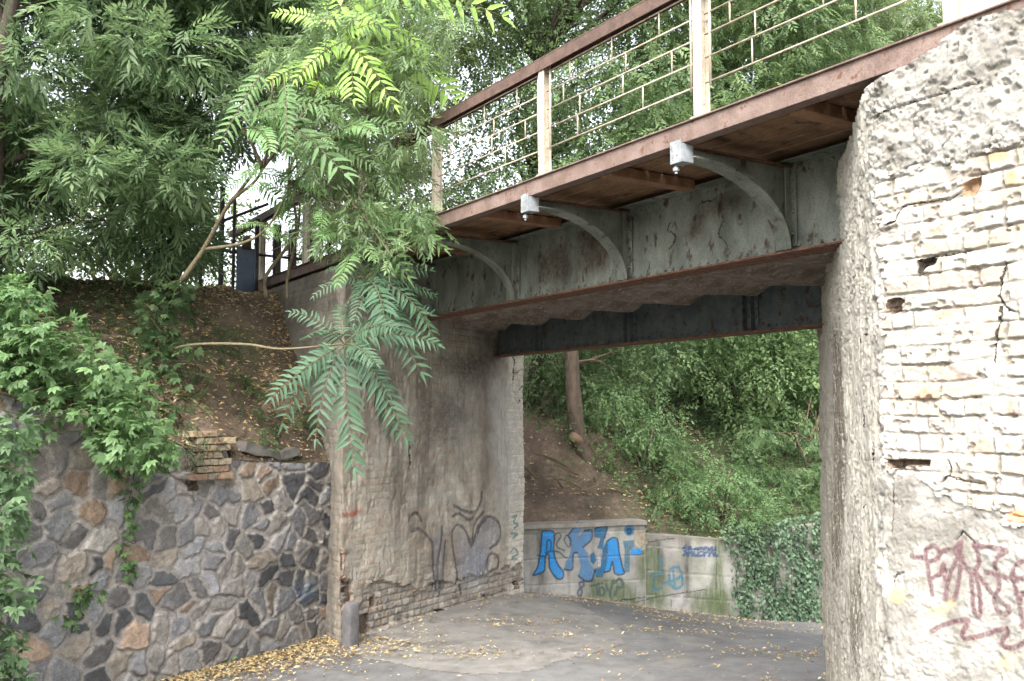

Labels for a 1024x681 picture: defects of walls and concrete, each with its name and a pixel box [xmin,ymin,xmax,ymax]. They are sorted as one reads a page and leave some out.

spalling [859,136,1024,528]
crack [994,263,1014,363]
spalling [337,546,524,636]